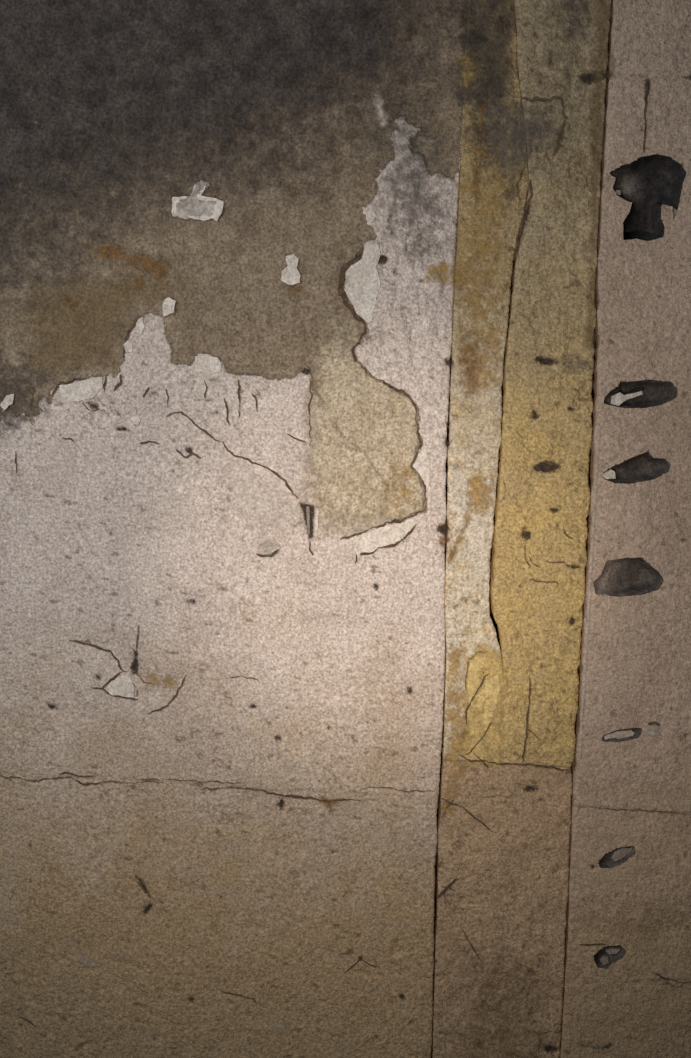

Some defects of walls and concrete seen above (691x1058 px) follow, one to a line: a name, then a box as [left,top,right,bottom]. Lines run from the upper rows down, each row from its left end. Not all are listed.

leakage [458,0,567,171]
leakage [580,0,613,212]
leakage [383,128,438,223]
spalling [609,154,686,241]
flaking render [0,0,467,558]
leakage [0,282,169,435]
crack [166,399,230,442]
spalling [604,380,678,408]
spalling [567,425,671,760]
crack [458,677,569,771]
crack [0,772,509,832]
spalling [591,846,636,868]